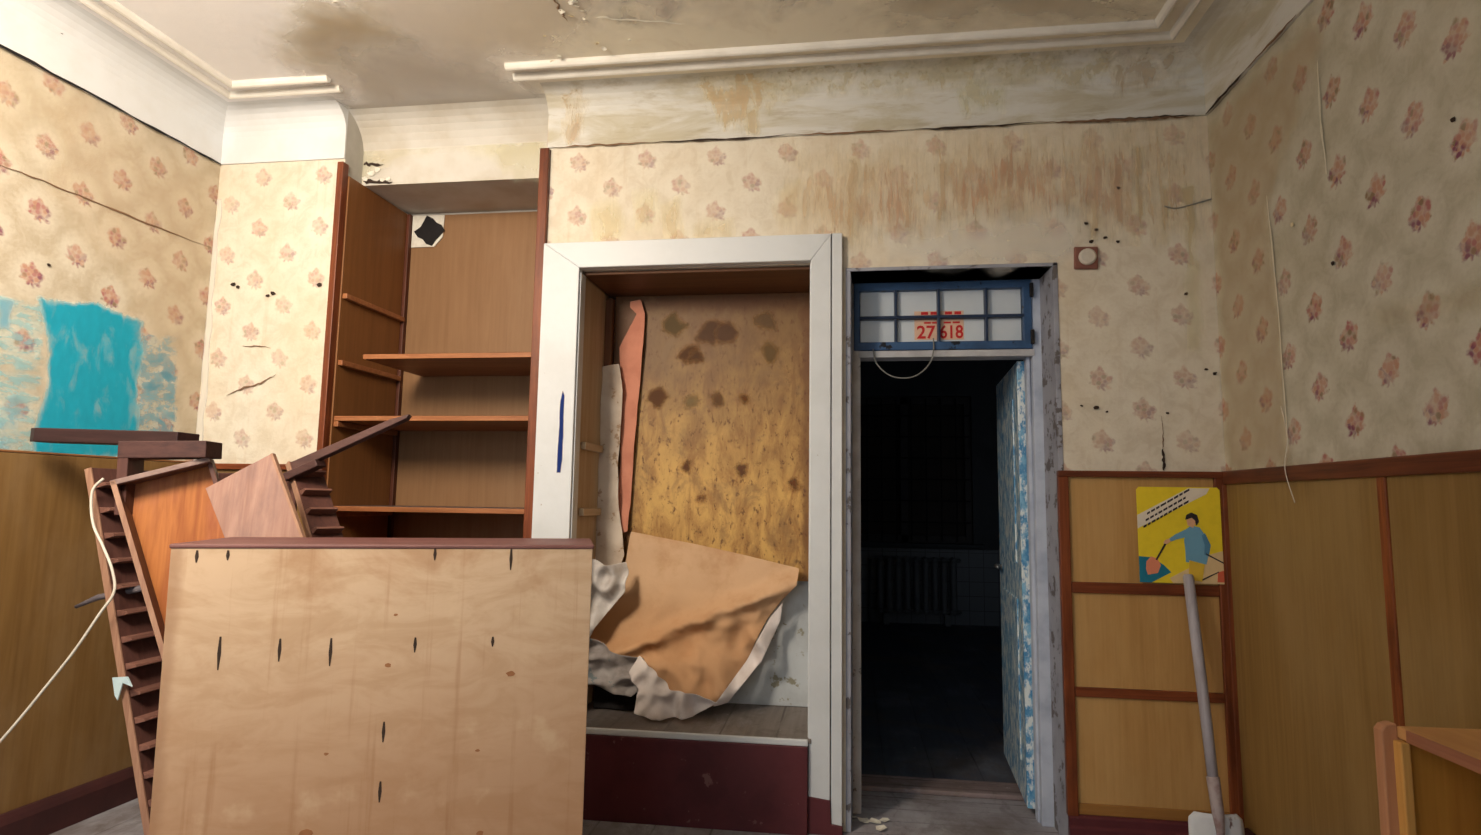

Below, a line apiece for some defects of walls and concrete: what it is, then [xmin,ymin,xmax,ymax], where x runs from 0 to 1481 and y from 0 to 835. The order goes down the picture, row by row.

water stain [293,12,404,60]